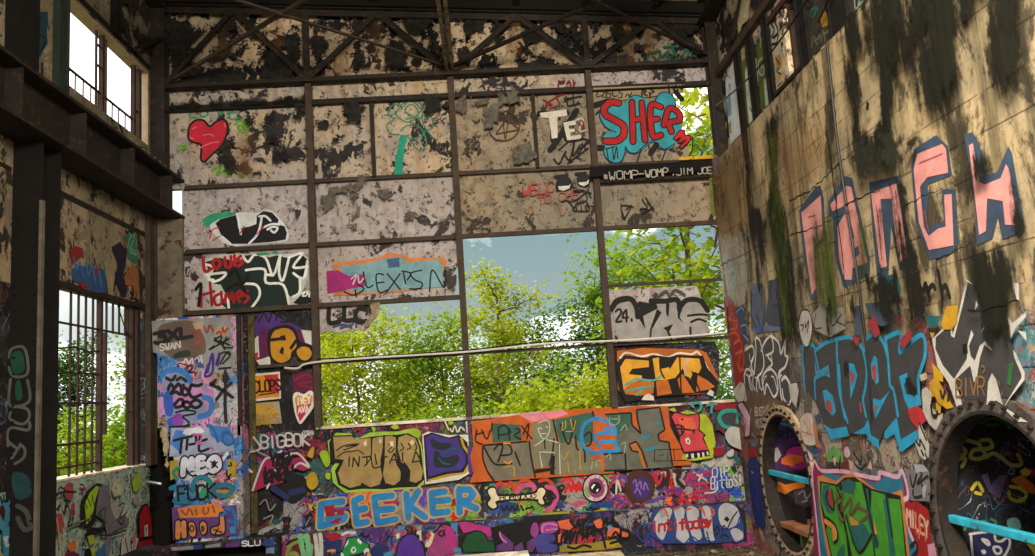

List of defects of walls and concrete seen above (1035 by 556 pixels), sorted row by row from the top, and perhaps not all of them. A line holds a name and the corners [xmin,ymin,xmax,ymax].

peeling [350,17,369,71]
peeling [380,18,485,73]
peeling [488,21,707,83]
water stain [987,0,1020,98]
peeling [216,136,237,175]
peeling [244,110,289,164]
peeling [294,96,367,145]
water stain [810,0,974,340]
water stain [964,152,990,185]
water stain [742,78,797,343]
water stain [1009,181,1026,240]
water stain [965,242,1025,347]